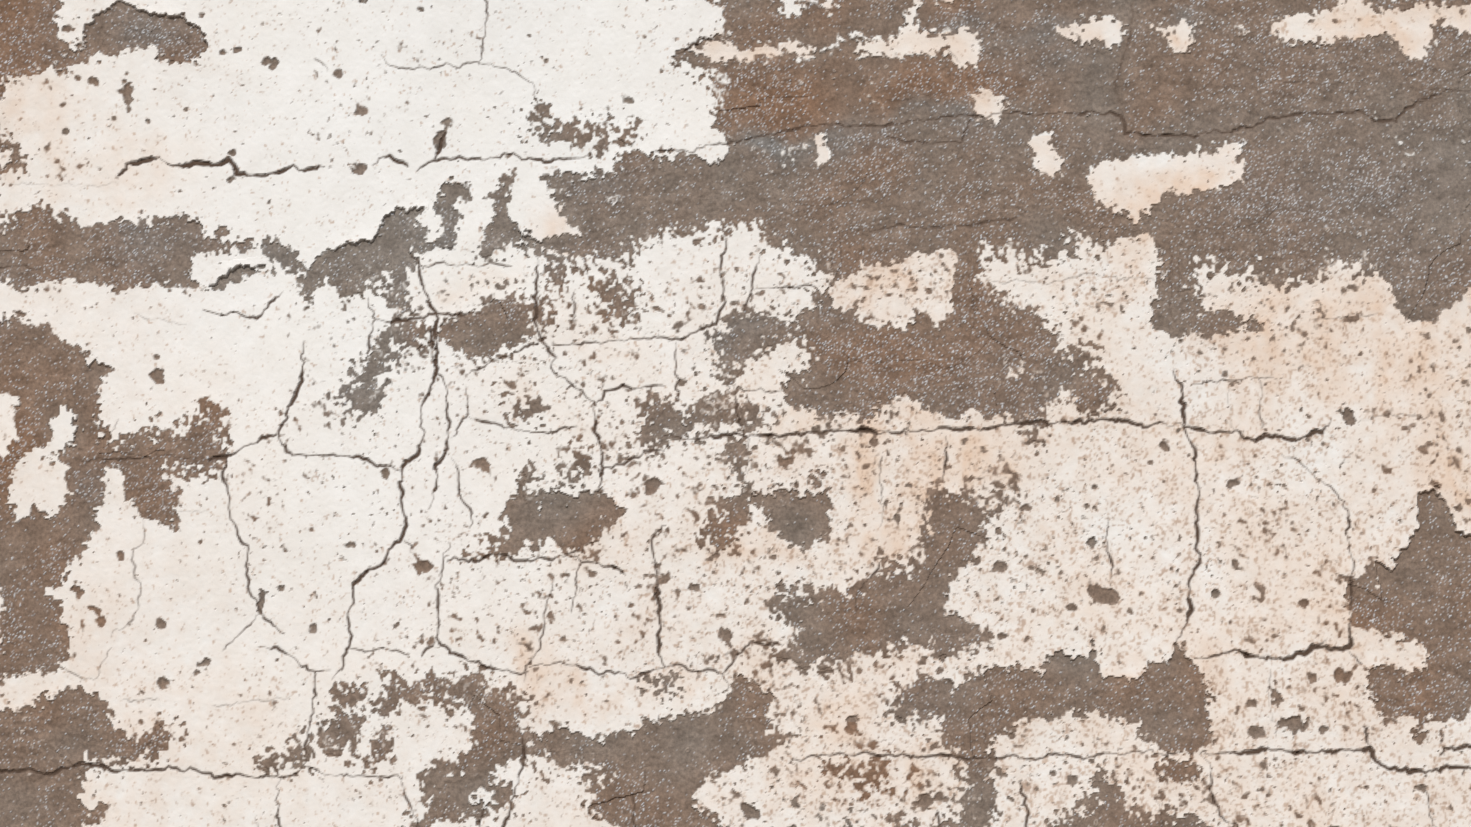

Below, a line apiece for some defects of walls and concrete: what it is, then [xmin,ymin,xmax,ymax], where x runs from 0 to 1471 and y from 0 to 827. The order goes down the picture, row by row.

crack [10,155,326,189]
crack [313,57,330,72]
crack [380,0,540,113]
crack [371,131,594,173]
peeling [0,0,1471,562]
peeling [0,311,235,827]
crack [0,210,1471,827]
peeling [253,441,1471,827]